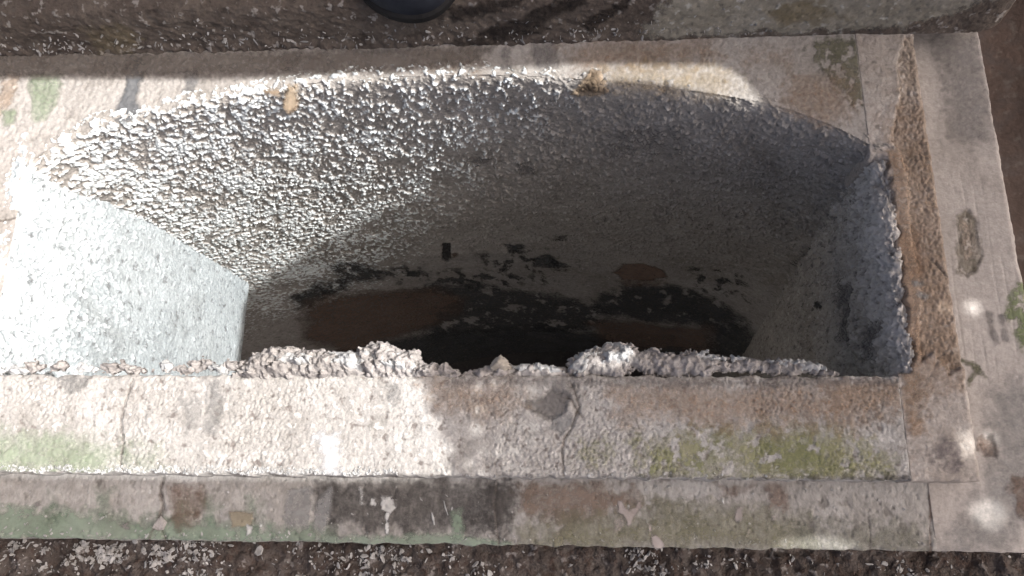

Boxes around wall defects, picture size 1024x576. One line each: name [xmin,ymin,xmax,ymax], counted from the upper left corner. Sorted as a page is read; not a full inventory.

leakage [291,245,753,365]
crack [562,386,580,470]